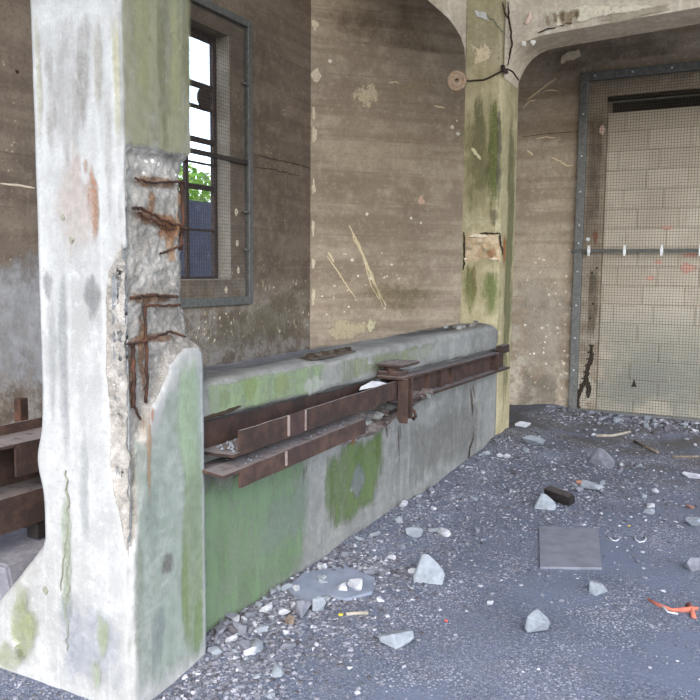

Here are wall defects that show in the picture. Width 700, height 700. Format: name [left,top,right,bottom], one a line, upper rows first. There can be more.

crack [254,154,311,176]
damp [471,103,502,198]
rust [84,167,98,229]
spalling [463,232,504,289]
spalling [106,146,248,556]
crack [577,344,594,408]
rust [143,409,154,490]
spalling [340,402,398,445]
crack [468,396,481,459]